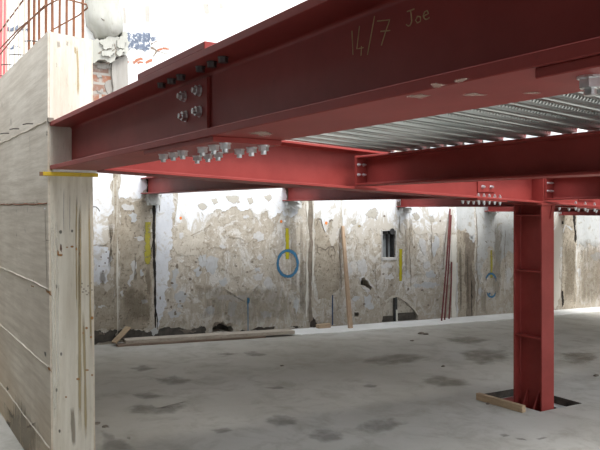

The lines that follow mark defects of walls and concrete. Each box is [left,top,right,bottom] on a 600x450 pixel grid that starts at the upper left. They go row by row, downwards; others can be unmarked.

spalling [93,31,169,101]
crack [150,205,158,330]
flaking render [81,173,298,345]
peeling [289,199,513,328]